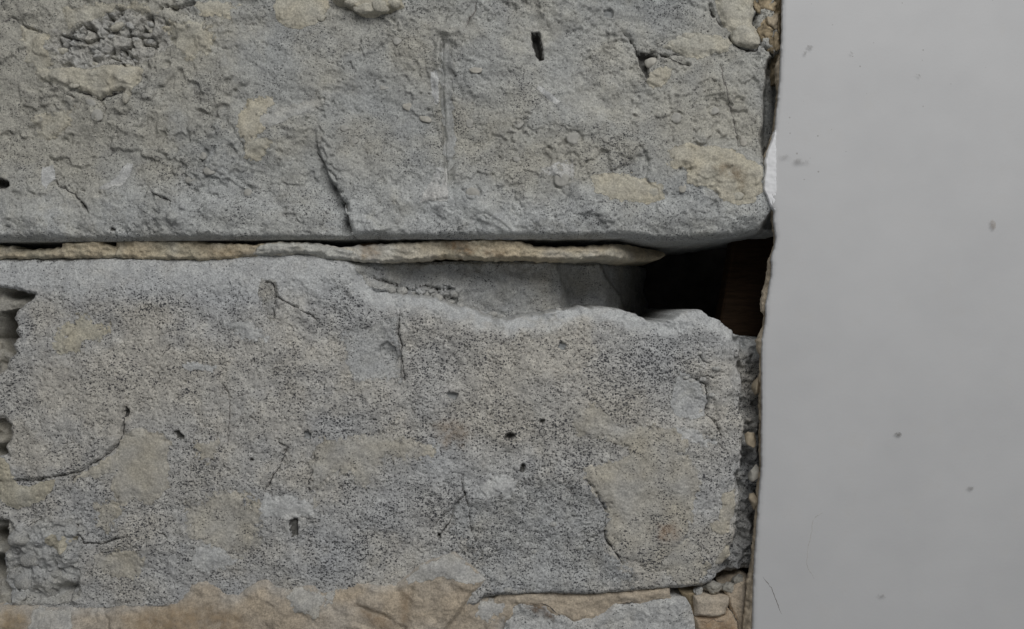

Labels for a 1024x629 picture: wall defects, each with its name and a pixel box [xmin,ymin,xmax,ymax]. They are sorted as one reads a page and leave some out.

crack [317,146,355,238]
spalling [354,262,668,318]
crack [17,407,128,482]